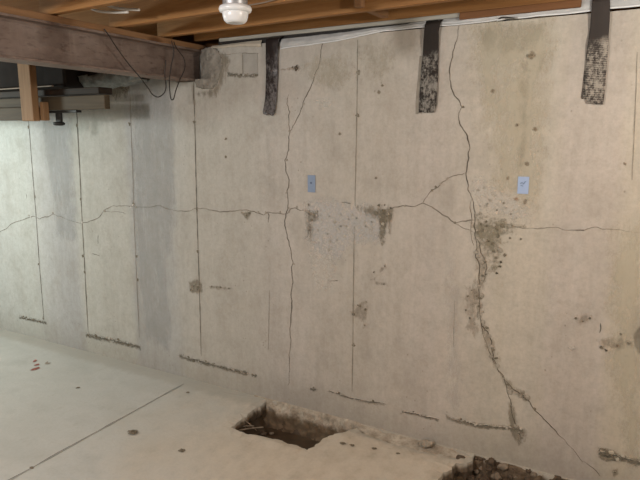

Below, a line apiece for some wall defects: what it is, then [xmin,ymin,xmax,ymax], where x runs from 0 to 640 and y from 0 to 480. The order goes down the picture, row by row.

crack [0,43,323,385]
crack [388,26,600,476]
crack [503,223,640,233]